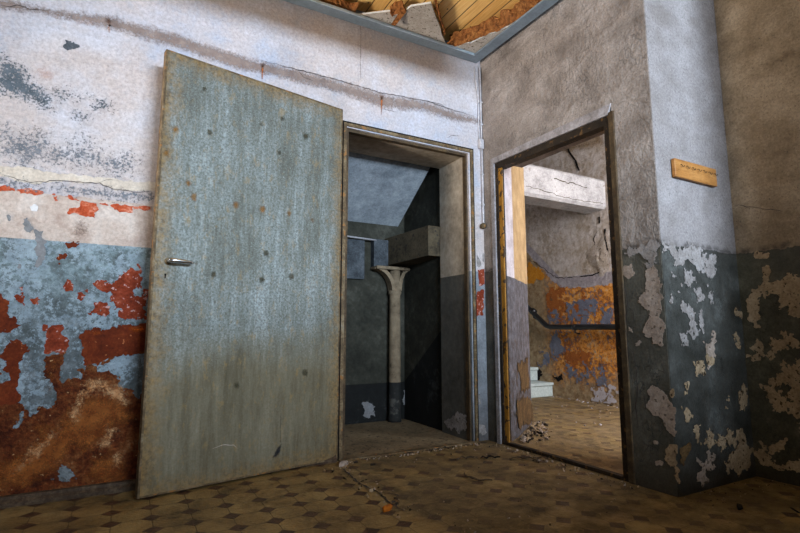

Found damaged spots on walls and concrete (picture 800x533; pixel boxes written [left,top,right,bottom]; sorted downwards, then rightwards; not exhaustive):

crack [253,49,476,117]
crack [5,175,136,193]
peeling [0,166,156,217]
crack [528,149,608,256]
spalling [23,217,47,268]
peeling [476,253,485,316]
peeling [0,264,149,496]
peeling [362,402,375,418]
peeling [444,411,467,434]
peeling [516,262,619,430]
peeling [623,239,800,487]